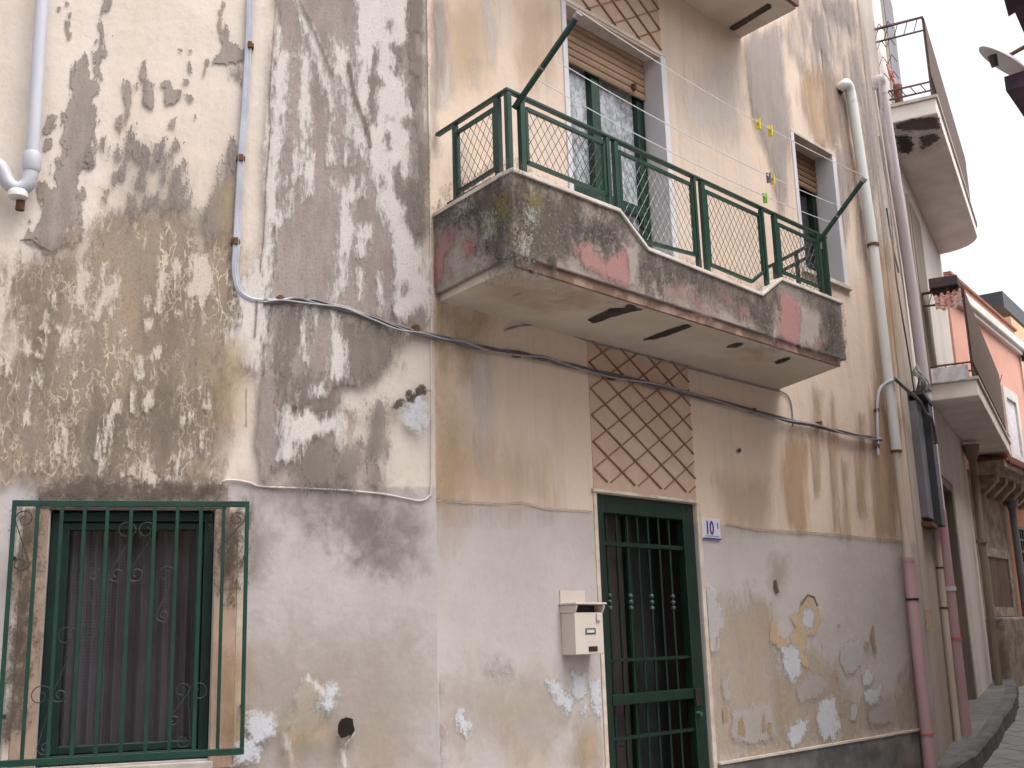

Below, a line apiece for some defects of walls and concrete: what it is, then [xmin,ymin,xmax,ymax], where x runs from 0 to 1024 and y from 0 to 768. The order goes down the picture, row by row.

leakage [365,0,451,130]
peeling [0,0,244,488]
flaking render [224,0,475,494]
leakage [379,158,781,346]
peeling [573,243,637,286]
leakage [745,0,942,385]
leakage [0,204,252,741]
leakage [784,383,901,537]
leakage [230,710,240,759]
peeling [234,674,338,765]
spalling [338,717,355,768]
peeling [722,595,894,749]